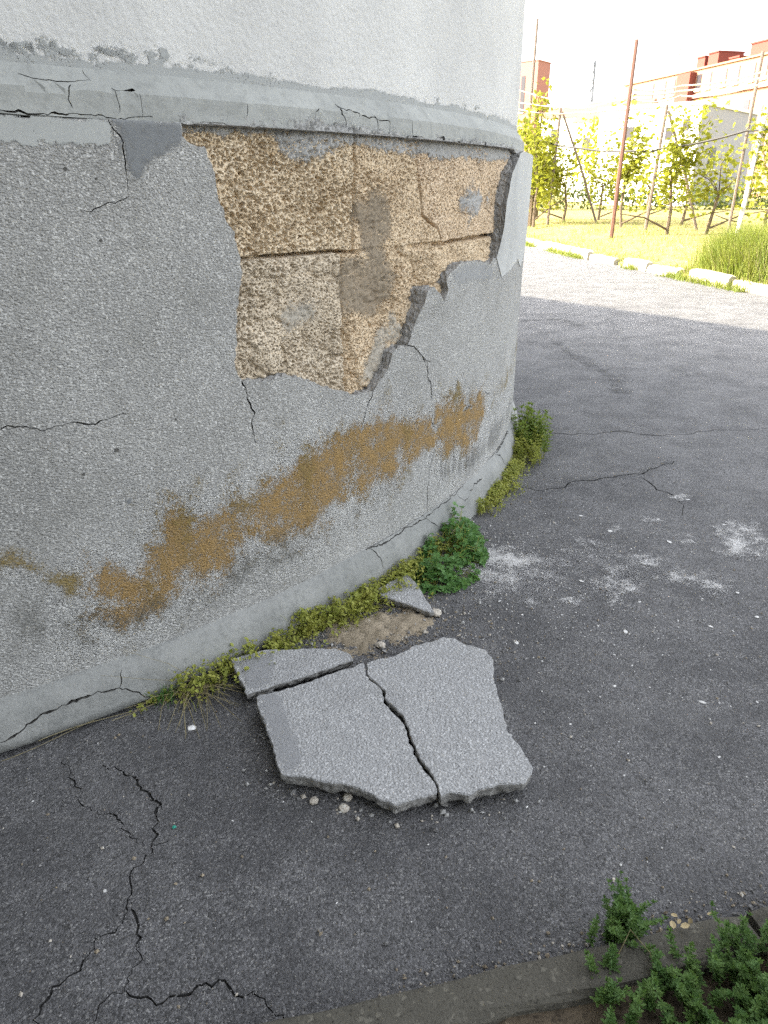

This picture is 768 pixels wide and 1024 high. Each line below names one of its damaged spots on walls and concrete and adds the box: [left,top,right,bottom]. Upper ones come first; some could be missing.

crack [0,70,152,212]
spalling [179,115,516,396]
crack [367,345,482,569]
crack [522,461,684,515]
crack [0,670,150,743]
crack [33,762,284,1024]